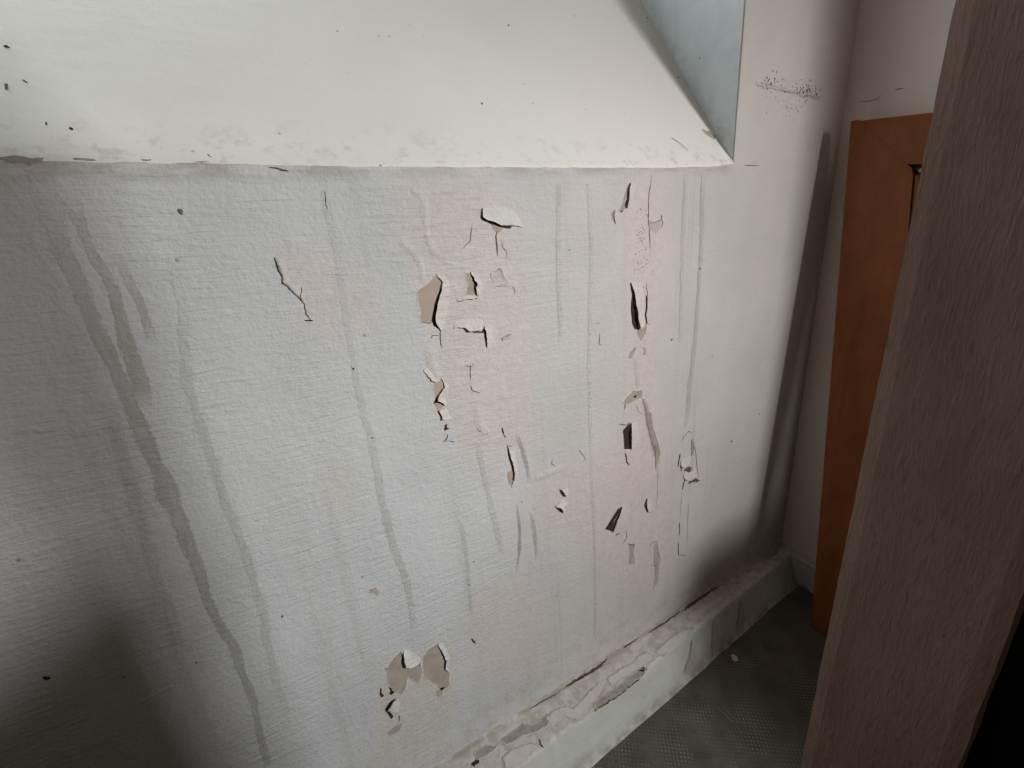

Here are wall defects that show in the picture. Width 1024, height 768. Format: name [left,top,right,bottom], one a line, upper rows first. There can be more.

peeling [482,205,523,256]
crack [274,256,313,321]
peeling [416,269,515,348]
peeling [629,281,648,358]
damp [25,170,271,767]
damp [167,256,294,727]
peeling [424,368,454,442]
damp [247,167,705,768]
peeling [621,388,661,470]
peeling [606,507,635,564]
peeling [380,643,451,737]
flaking render [471,714,551,767]